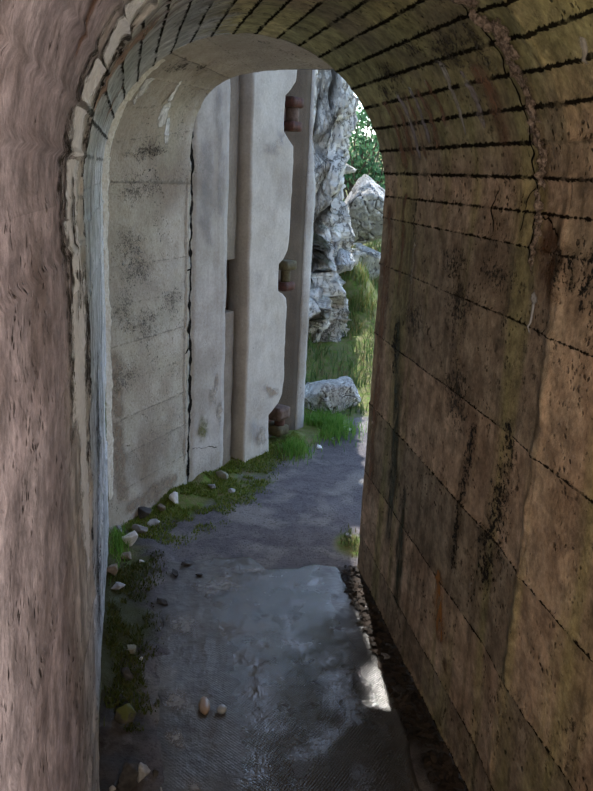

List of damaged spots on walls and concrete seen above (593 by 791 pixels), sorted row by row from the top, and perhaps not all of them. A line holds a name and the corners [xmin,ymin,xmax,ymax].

crack [461,4,558,264]
water stain [387,321,406,608]
water stain [451,419,477,574]
water stain [475,419,517,599]